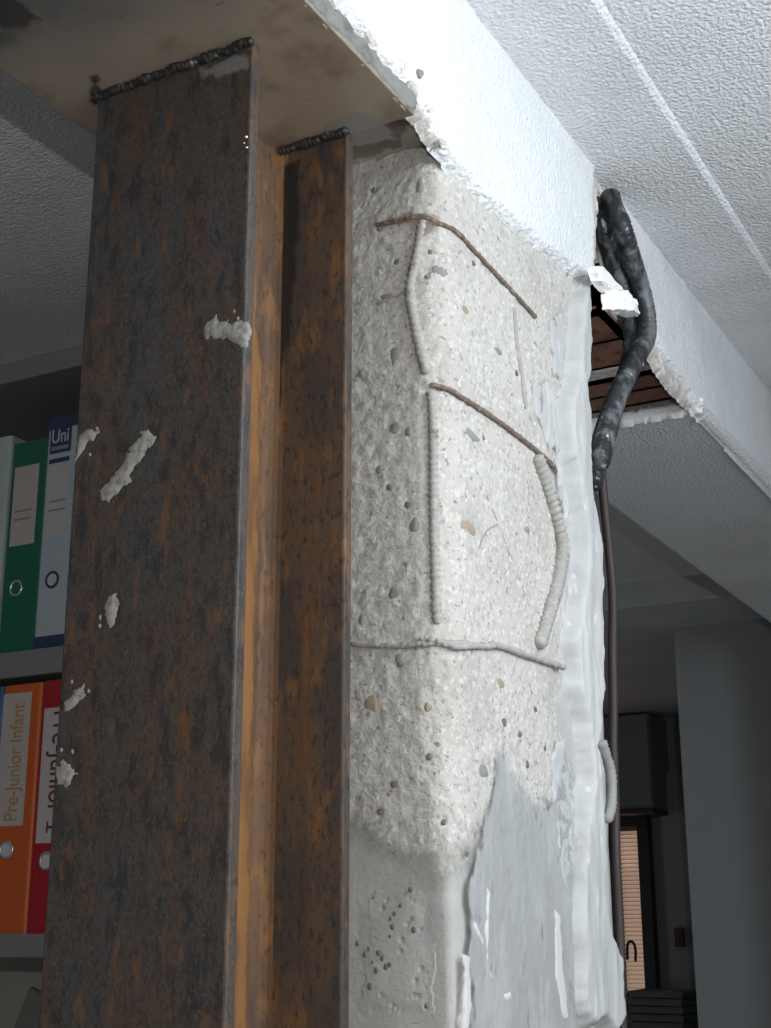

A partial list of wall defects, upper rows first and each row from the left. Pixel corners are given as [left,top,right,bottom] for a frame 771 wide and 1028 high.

rust [234,304,264,1028]
spalling [329,0,627,1028]
spalling [620,345,703,428]